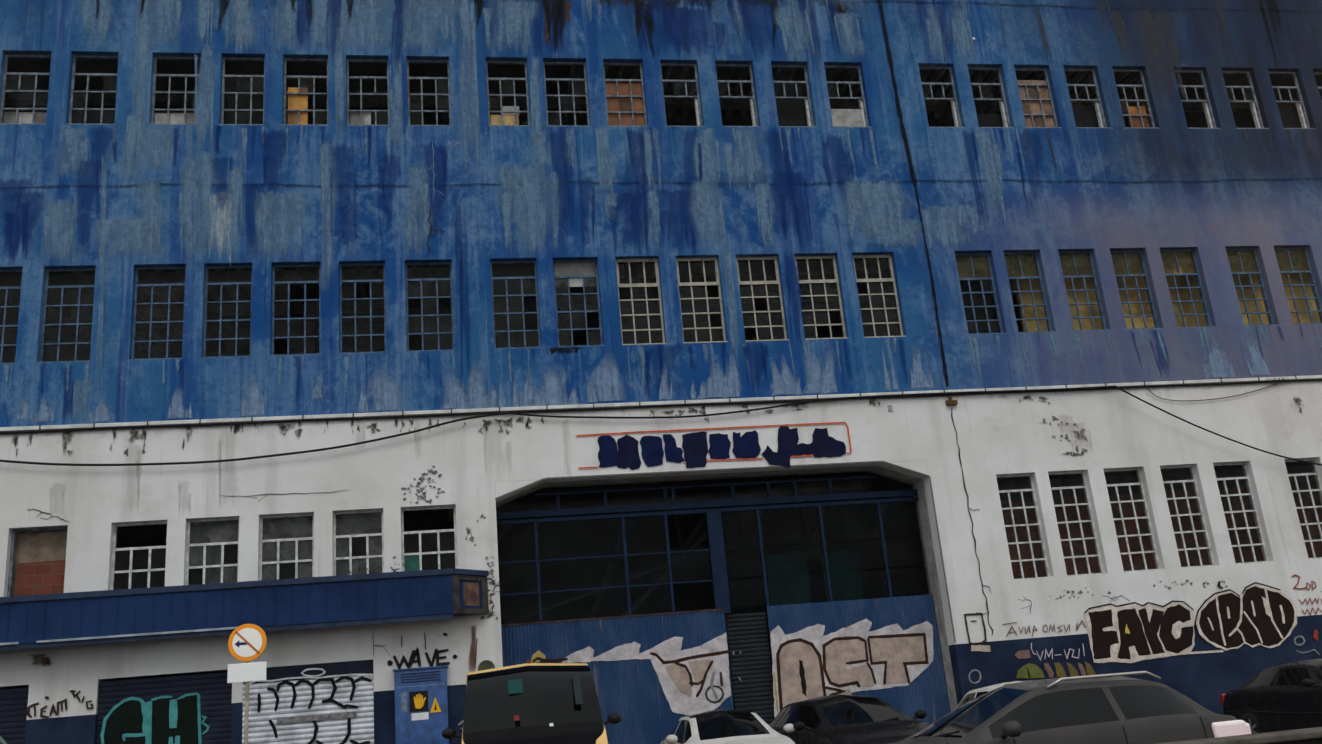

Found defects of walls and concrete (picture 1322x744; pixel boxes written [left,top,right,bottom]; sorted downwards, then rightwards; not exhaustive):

damp [207,0,250,47]
damp [275,0,353,51]
damp [69,0,153,257]
damp [195,55,220,139]
damp [381,65,393,207]
damp [441,0,495,169]
damp [198,127,268,262]
crack [27,508,70,522]
damp [110,428,146,455]
peeling [168,392,192,419]
peeling [401,466,445,504]
crack [928,283,994,635]